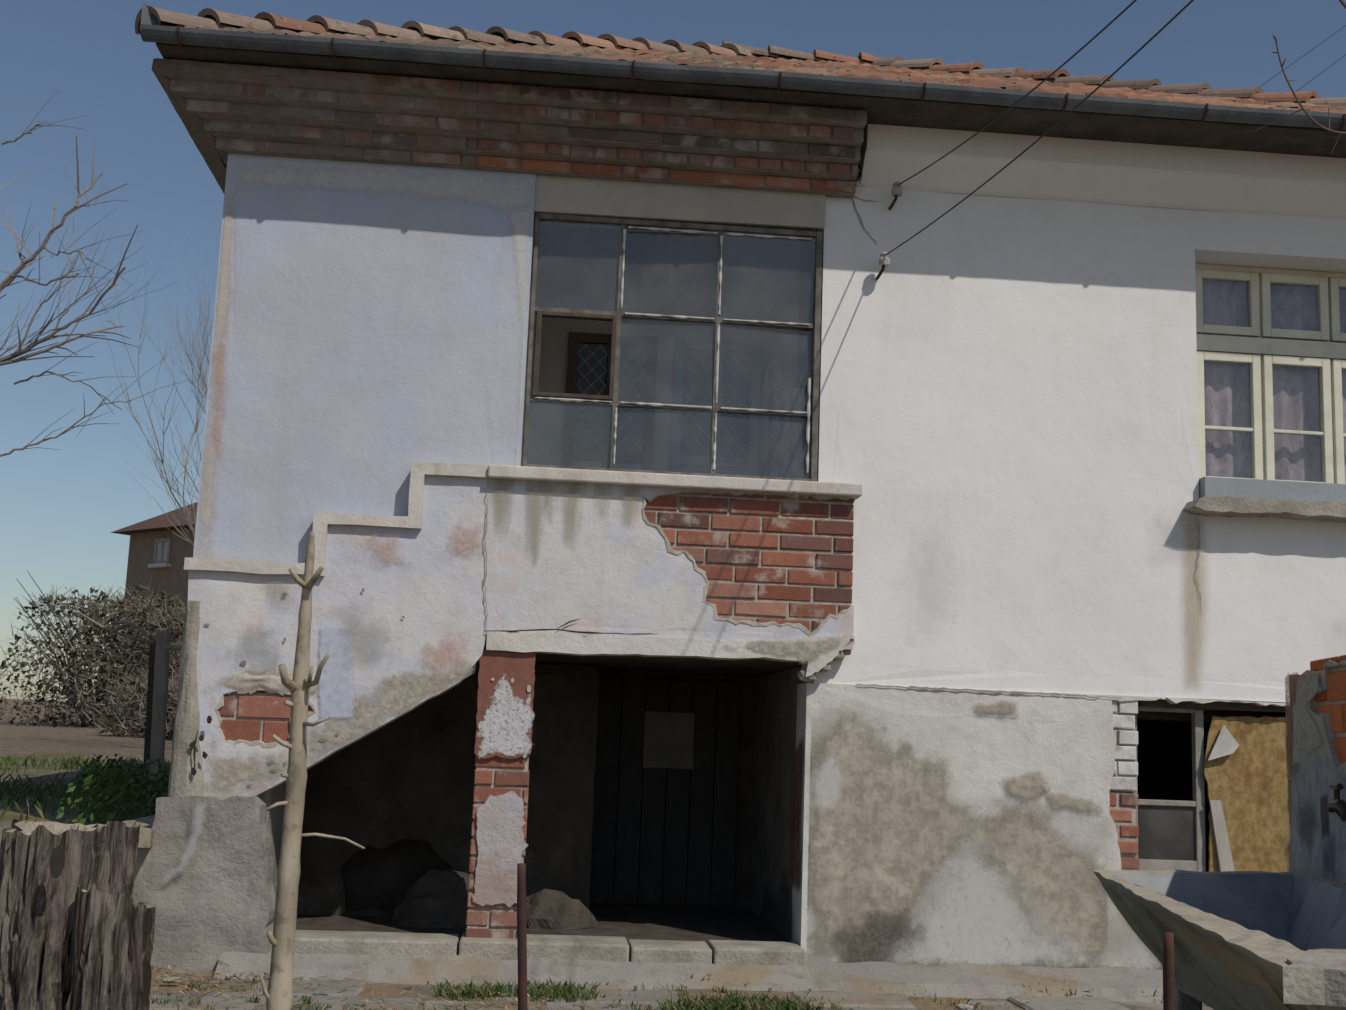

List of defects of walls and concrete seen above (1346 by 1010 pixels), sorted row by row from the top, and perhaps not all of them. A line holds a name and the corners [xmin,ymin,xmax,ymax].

crack [484,484,652,635]
flaking render [642,489,854,662]
flaking render [172,660,291,875]
flaking render [308,625,473,761]
peeling [478,675,535,758]
flaking render [1109,792,1139,871]
flaking render [1310,655,1346,767]